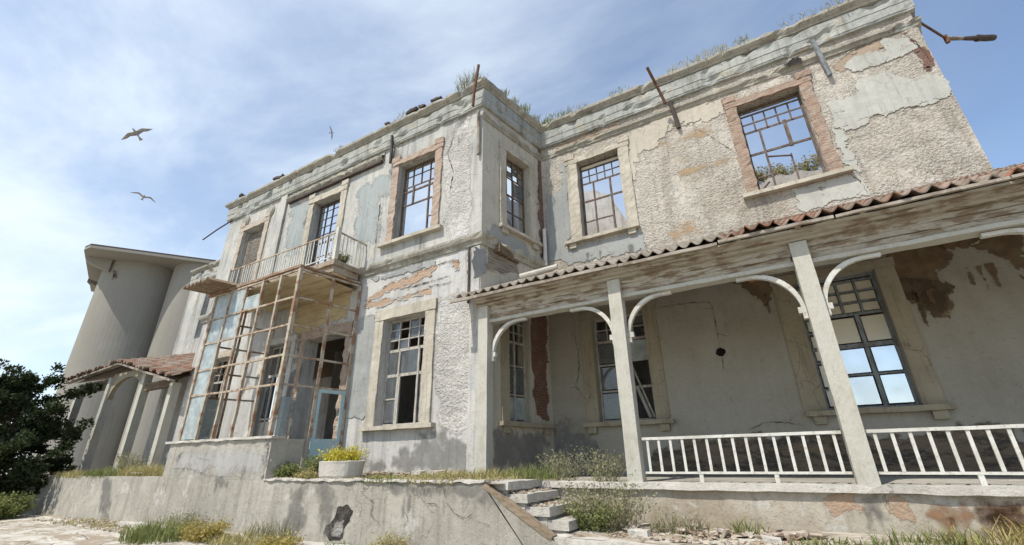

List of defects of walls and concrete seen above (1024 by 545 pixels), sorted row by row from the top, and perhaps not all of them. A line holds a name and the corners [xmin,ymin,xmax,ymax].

spalling [833,39,888,72]
spalling [903,32,934,70]
spalling [363,265,437,309]
spalling [530,316,549,421]
spalling [823,493,864,517]